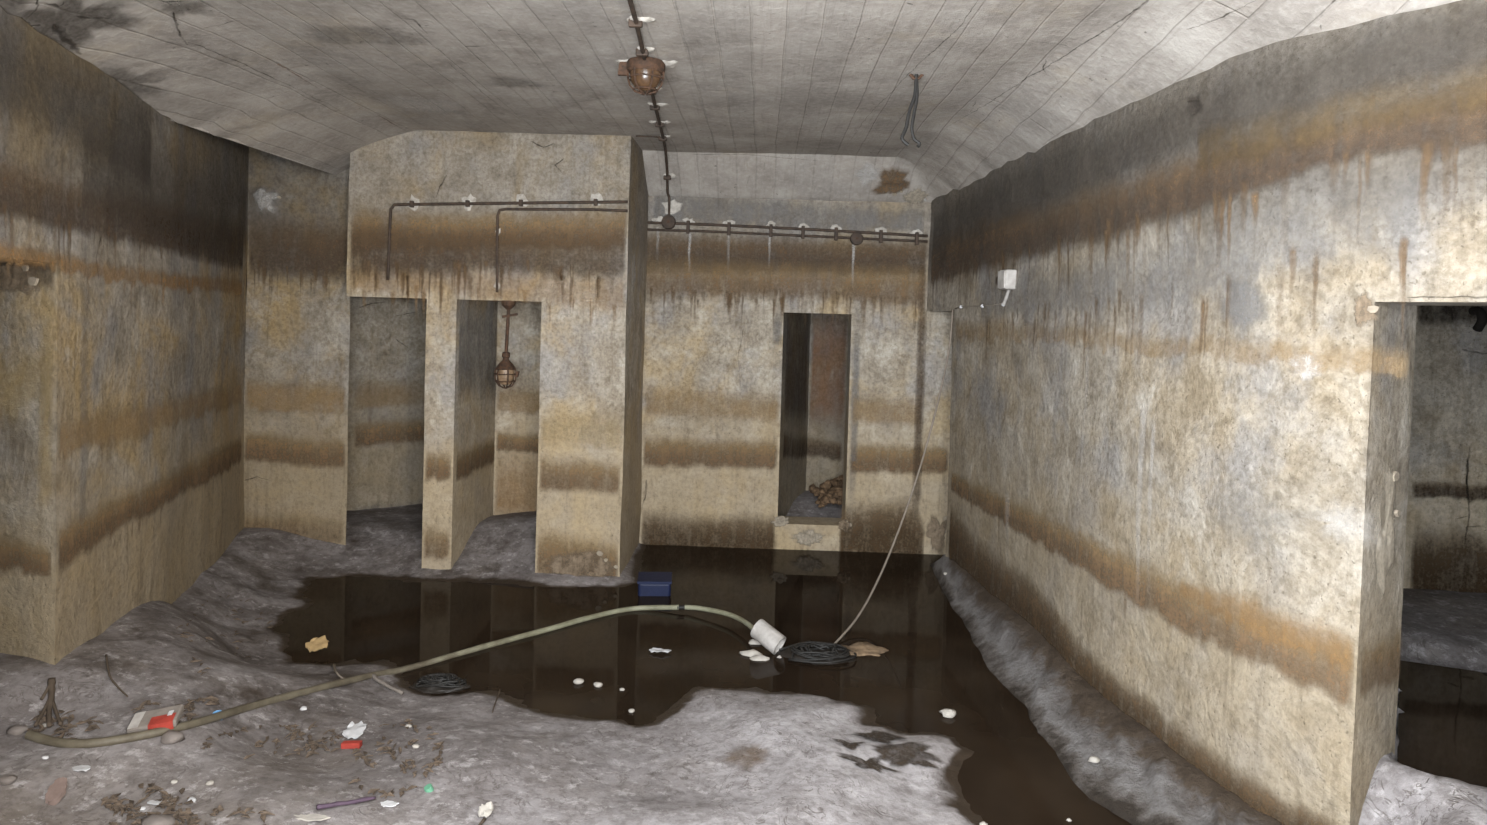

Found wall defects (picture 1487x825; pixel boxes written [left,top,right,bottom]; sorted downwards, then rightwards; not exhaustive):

leakage [0,0,129,50]
leakage [0,167,635,290]
leakage [643,11,1487,703]
leakage [0,422,424,575]
leakage [426,534,448,558]
leakage [426,434,618,492]
leakage [538,538,617,577]
leakage [949,511,1329,825]